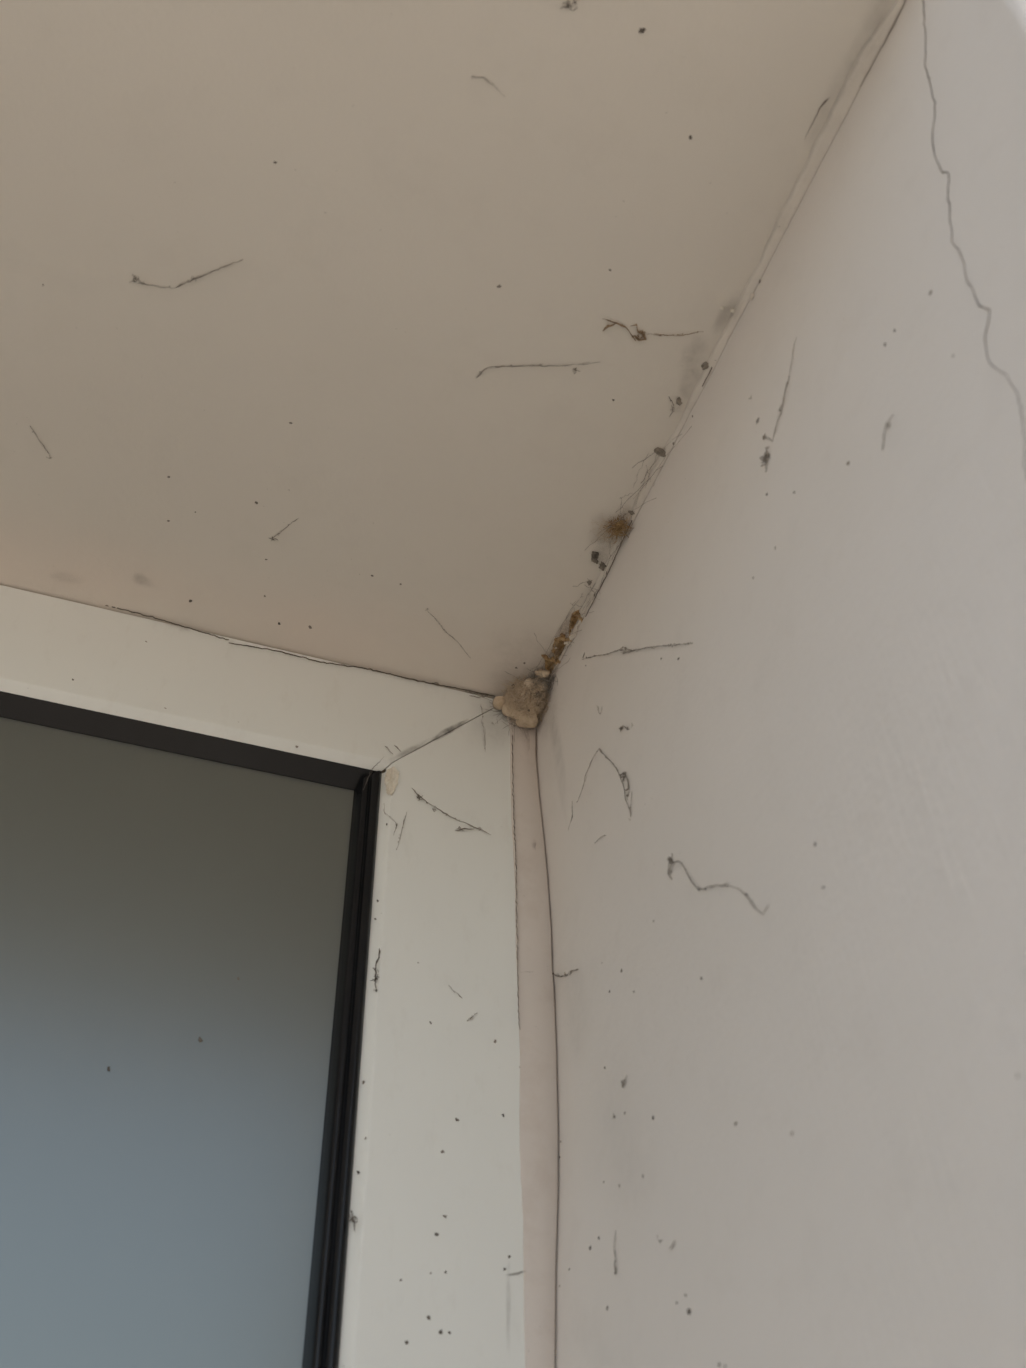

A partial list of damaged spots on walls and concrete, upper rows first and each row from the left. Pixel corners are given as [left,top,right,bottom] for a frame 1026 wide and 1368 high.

crack [860,0,1026,469]